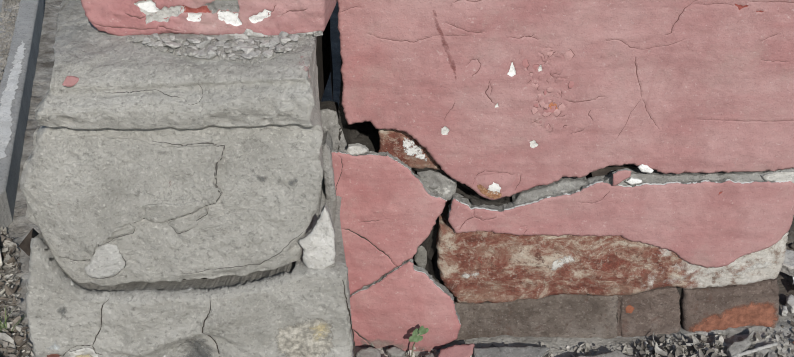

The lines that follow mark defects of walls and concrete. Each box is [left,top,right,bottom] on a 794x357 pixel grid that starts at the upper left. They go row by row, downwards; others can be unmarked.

peeling [134,0,323,38]
crack [367,23,482,42]
crack [609,0,731,136]
crack [580,166,639,204]
crack [345,220,394,264]
crack [424,171,521,276]
crack [63,300,108,356]
crack [202,301,220,354]